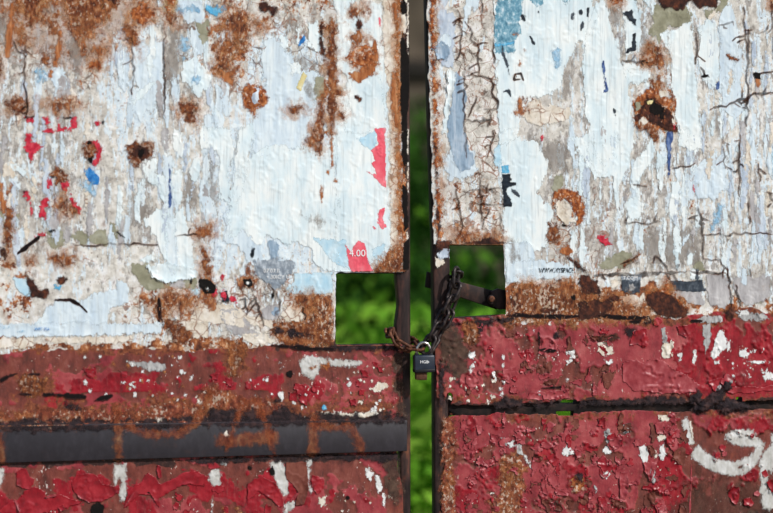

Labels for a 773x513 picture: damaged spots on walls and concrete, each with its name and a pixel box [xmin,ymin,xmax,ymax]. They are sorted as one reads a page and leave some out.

corrosion [0,0,178,78]
corrosion [304,4,380,156]
corrosion [369,0,405,272]
crack [452,10,524,236]
crack [596,7,773,306]
peeling [545,174,586,258]
corrosion [150,287,200,345]
peeling [131,250,304,347]
corrosion [508,257,690,330]
peeling [466,261,773,400]
peeling [247,462,326,513]
peeling [457,412,693,513]